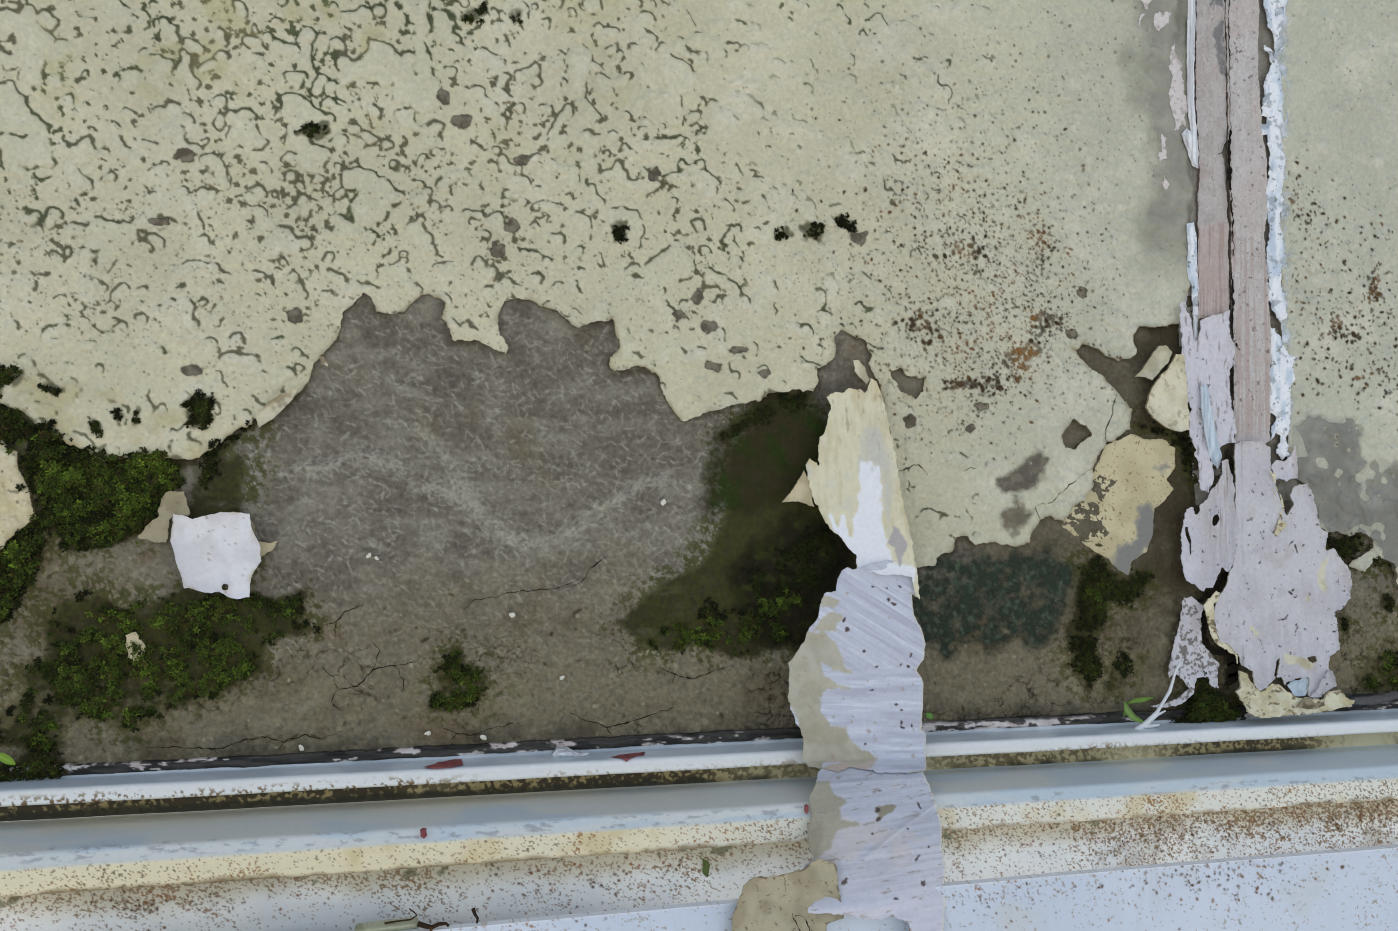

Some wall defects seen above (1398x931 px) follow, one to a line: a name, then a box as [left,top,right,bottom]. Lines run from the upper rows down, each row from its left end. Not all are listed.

corrosion [833,126,1113,460]
peeling [0,289,1398,931]
corrosion [111,882,245,931]
corrosion [518,857,655,902]
corrosion [990,799,1398,902]